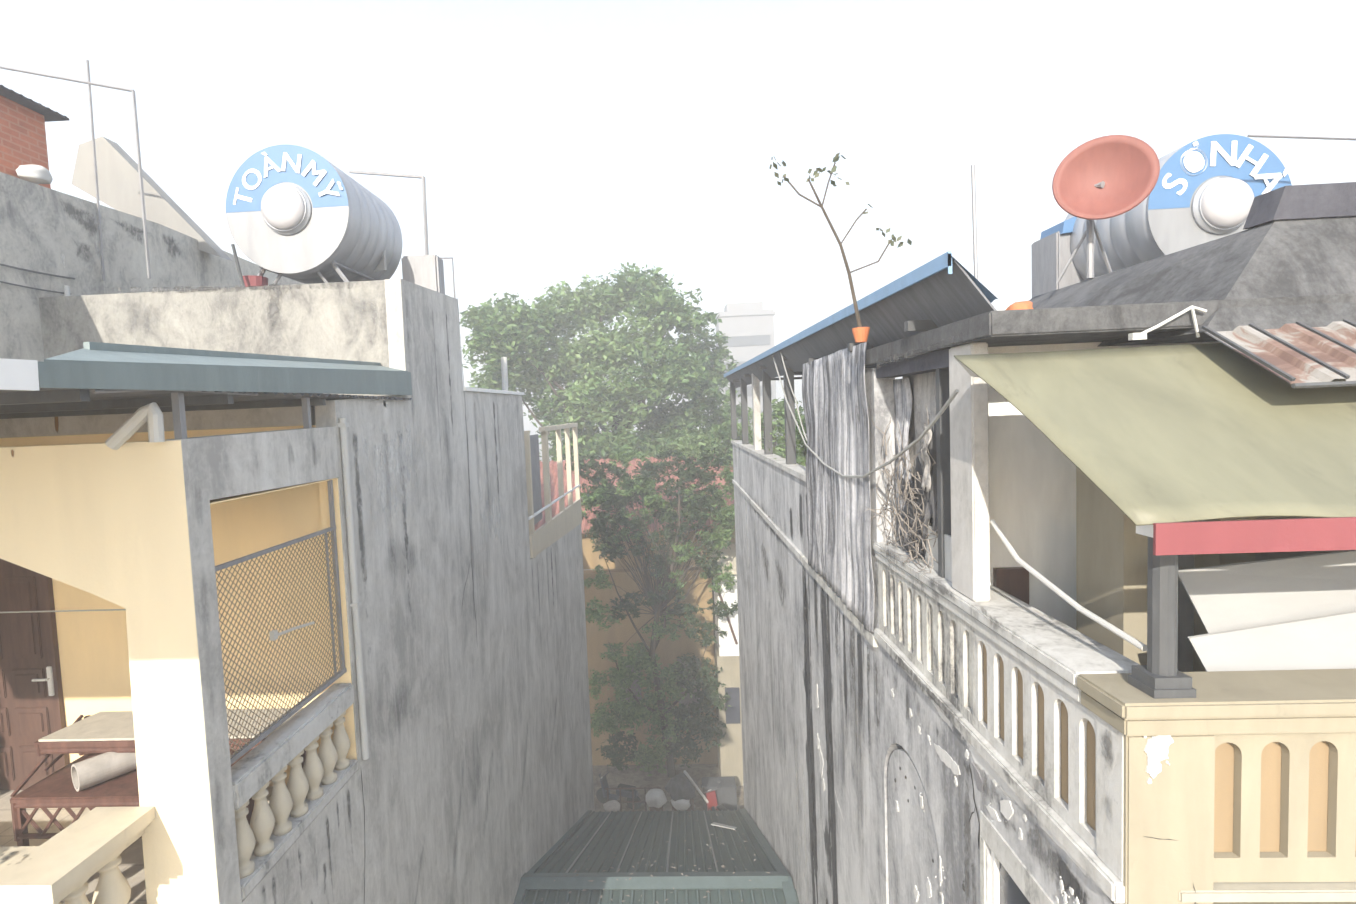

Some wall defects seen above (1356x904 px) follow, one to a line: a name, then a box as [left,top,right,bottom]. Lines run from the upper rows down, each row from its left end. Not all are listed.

water stain [875,547,945,664]
water stain [795,570,1087,904]
water stain [1103,735,1112,759]
peeling [1143,736,1174,784]
flaking render [1056,876,1080,904]